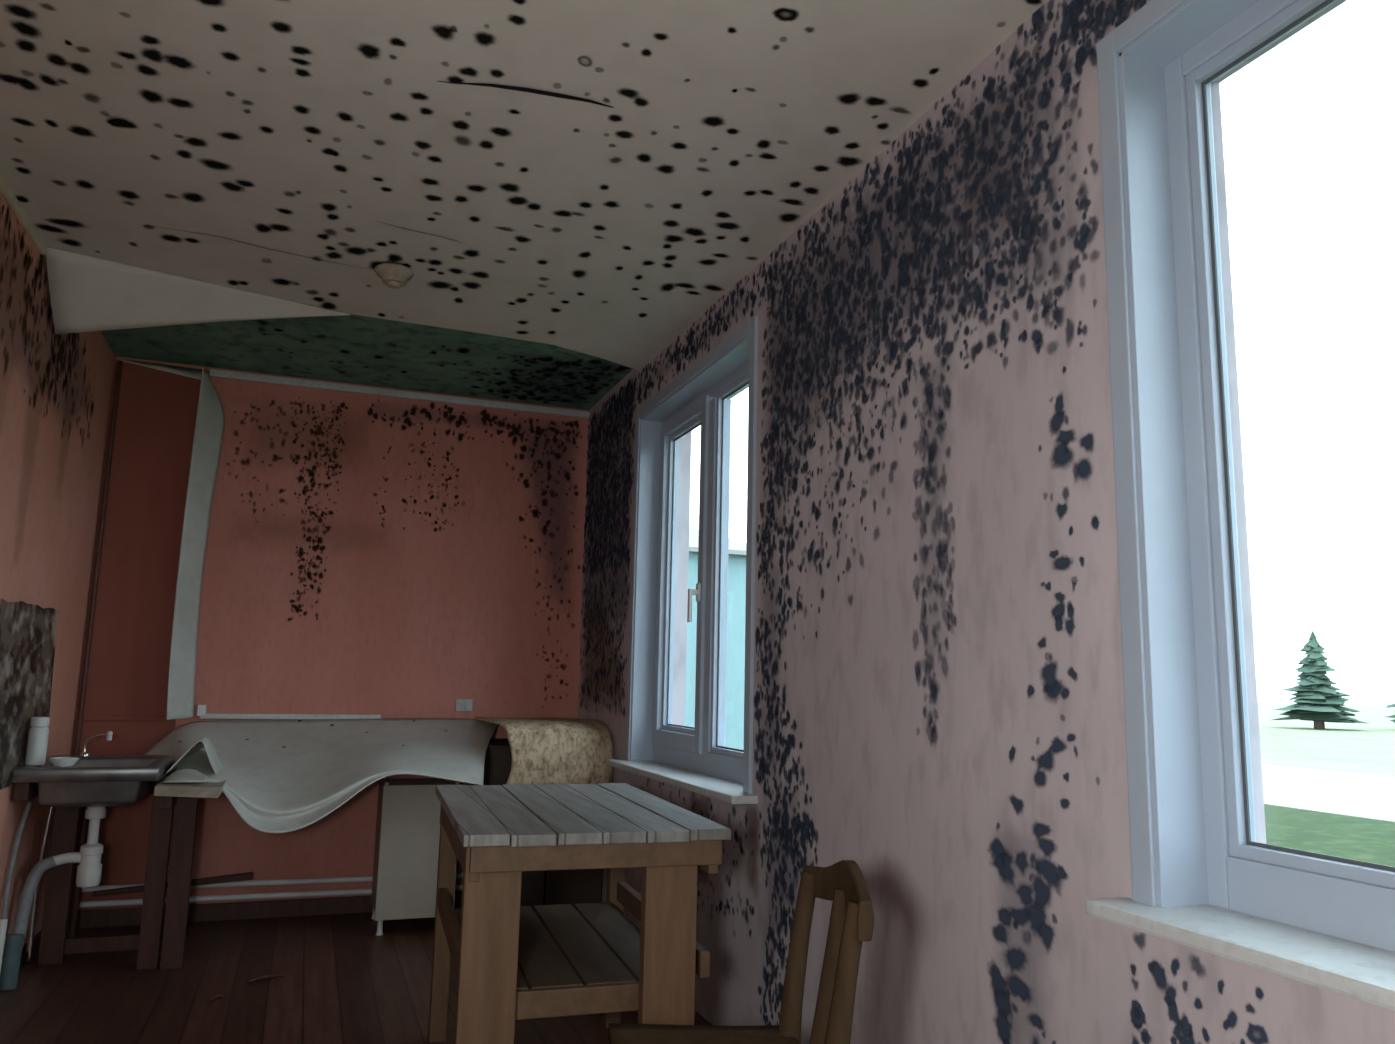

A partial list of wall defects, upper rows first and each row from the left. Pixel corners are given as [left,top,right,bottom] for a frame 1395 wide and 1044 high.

damp [0,5,89,90]
damp [118,36,192,107]
damp [358,38,405,59]
damp [13,118,93,142]
damp [256,191,300,232]
damp [314,168,619,303]
damp [2,196,100,414]
peeling [46,246,350,334]
peeling [117,358,225,720]
damp [273,401,348,621]
damp [368,0,1146,1044]
damp [1130,958,1268,1044]